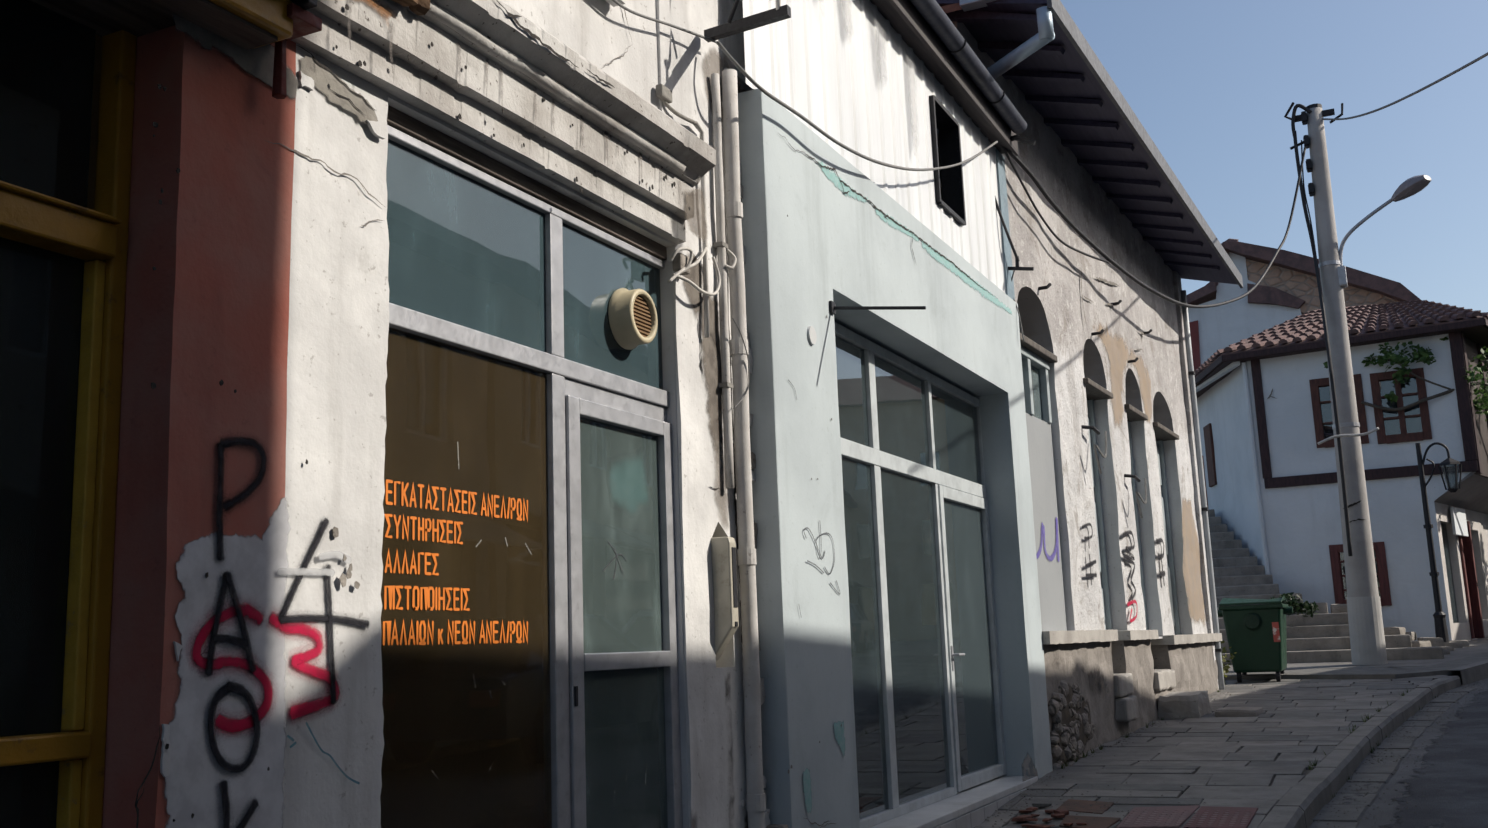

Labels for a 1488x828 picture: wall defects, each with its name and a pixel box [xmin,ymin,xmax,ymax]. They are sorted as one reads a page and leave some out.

corrosion [361,0,391,18]
flaking render [297,56,385,140]
crack [265,140,385,227]
crack [782,136,998,299]
peeling [160,497,291,828]